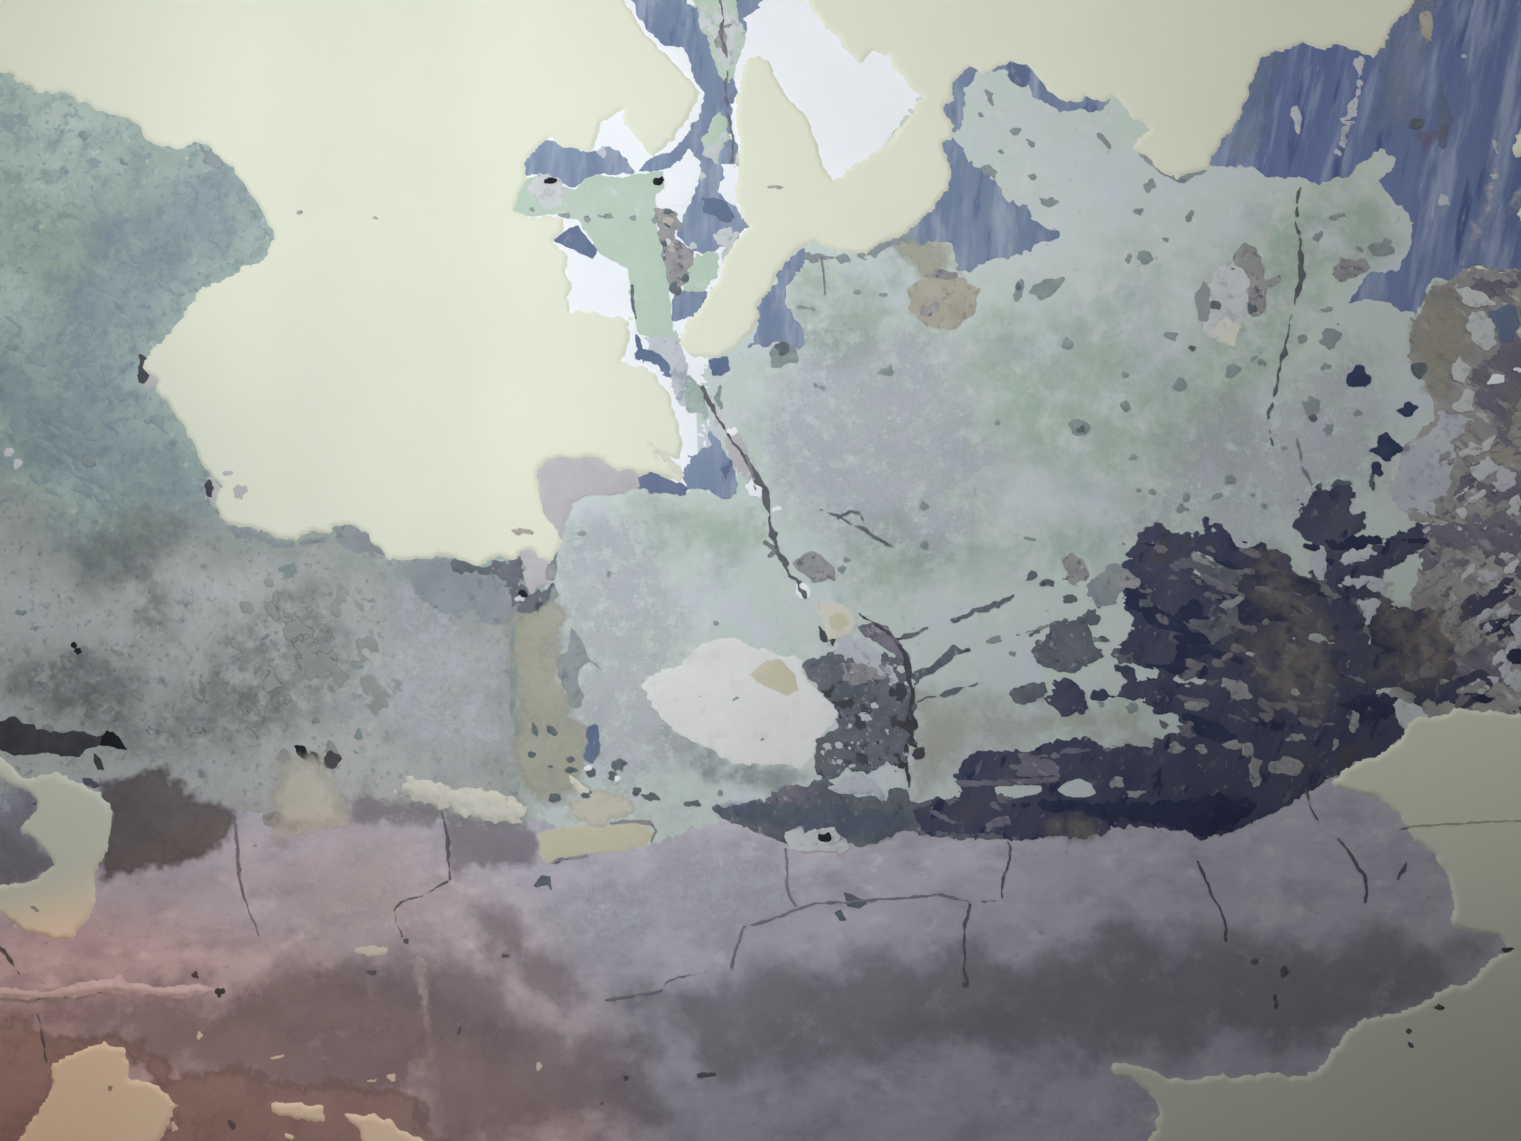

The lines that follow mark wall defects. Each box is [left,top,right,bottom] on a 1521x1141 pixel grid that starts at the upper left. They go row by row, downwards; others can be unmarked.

peeling [0,72,527,829]
crack [700,385,811,599]
peeling [512,0,1521,854]
crack [1267,186,1313,485]
leakage [274,758,346,836]
leakage [509,601,660,803]
crack [0,947,20,975]
crack [37,1014,47,1064]
flaking render [0,769,1507,1141]
crack [605,841,1012,1001]